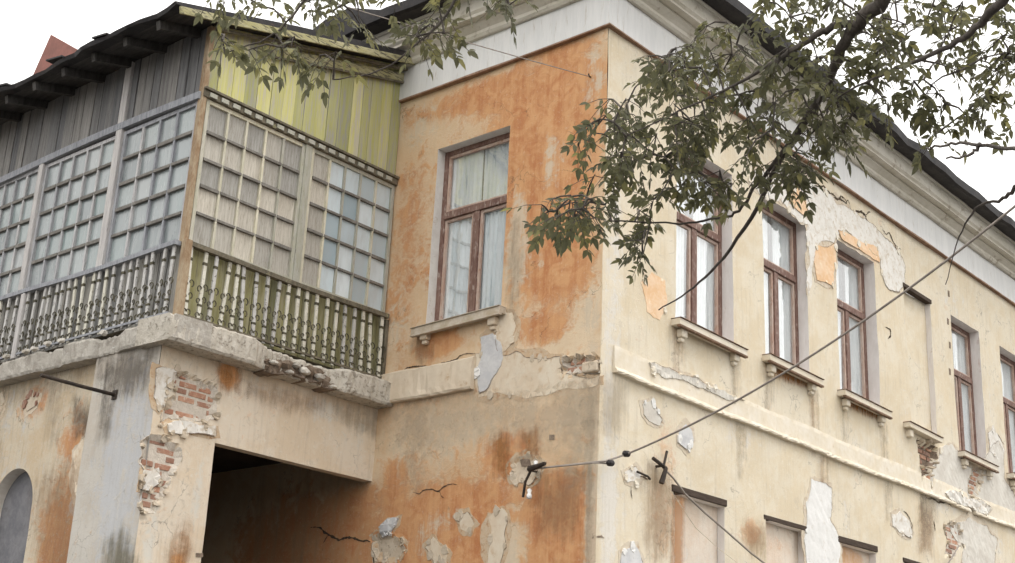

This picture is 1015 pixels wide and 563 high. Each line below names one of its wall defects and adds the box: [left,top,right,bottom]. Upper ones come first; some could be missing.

flaking render [747,162,906,295]
flaking render [494,332,602,379]
flaking render [136,362,222,514]
spalling [916,439,944,487]
flaking render [934,425,1006,563]
crack [311,527,374,563]
spalling [369,529,408,563]
peeling [422,533,453,563]
peeling [452,505,512,563]
flaking render [618,541,645,563]
flaking render [801,476,843,563]
flaking render [890,508,915,540]